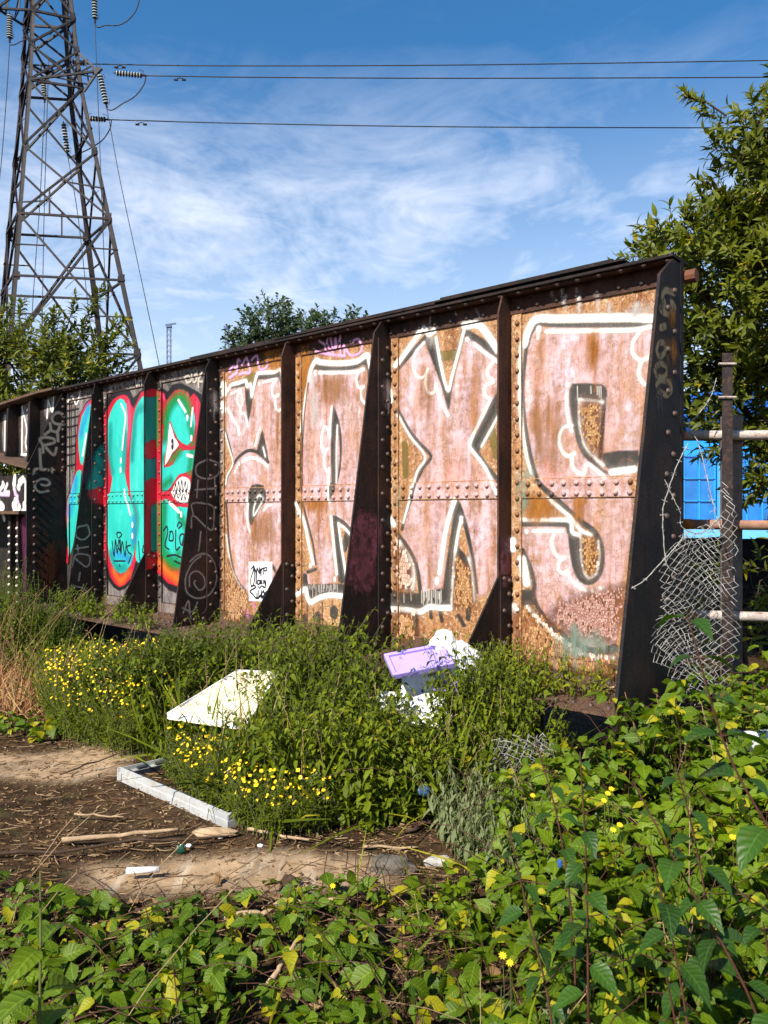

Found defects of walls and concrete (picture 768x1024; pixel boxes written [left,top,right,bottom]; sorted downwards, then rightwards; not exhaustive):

corrosion [589,333,598,364]
corrosion [297,348,310,405]
corrosion [526,497,550,522]